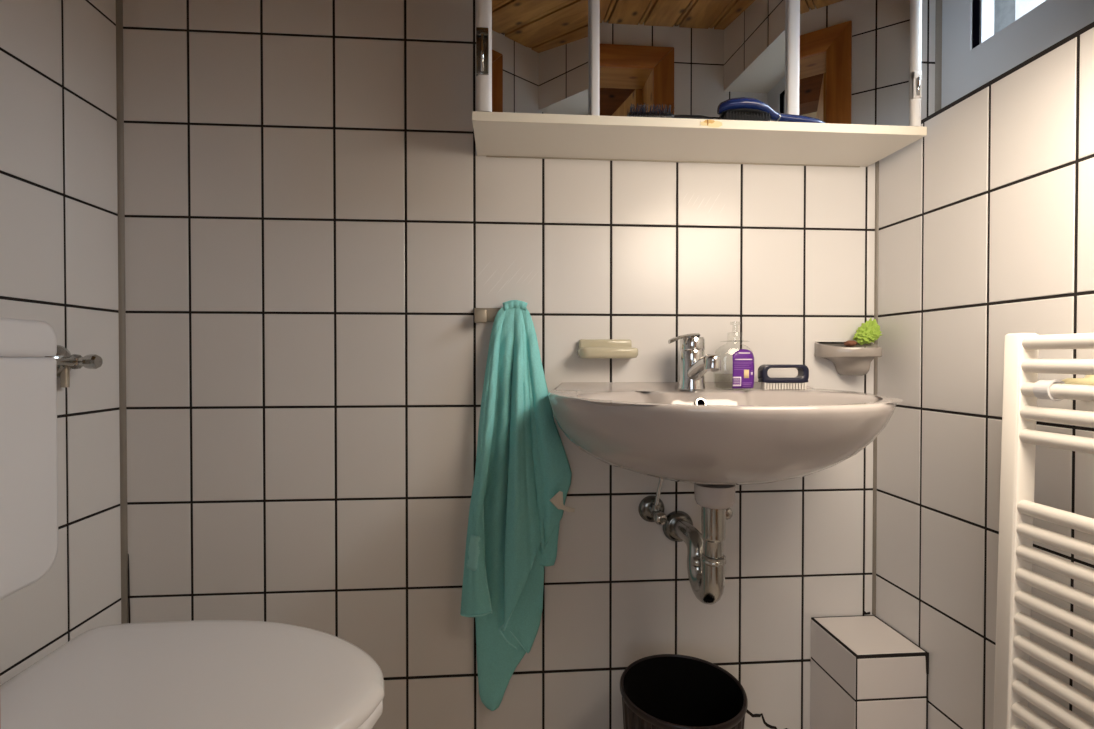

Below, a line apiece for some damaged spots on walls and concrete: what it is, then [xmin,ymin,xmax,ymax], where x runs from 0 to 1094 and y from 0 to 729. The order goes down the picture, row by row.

crack [746,709,787,729]